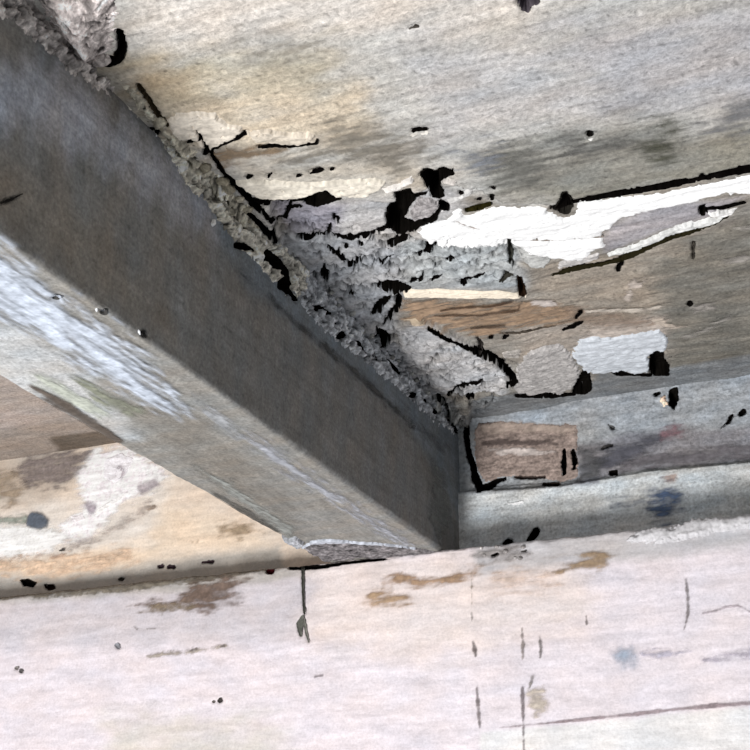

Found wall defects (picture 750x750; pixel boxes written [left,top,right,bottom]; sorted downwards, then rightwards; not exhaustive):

peeling [167,111,317,168]
hole [410,127,429,137]
peeling [235,167,750,269]
spalling [517,275,527,297]
spalling [293,263,464,435]
peeling [502,317,670,396]
spalling [474,421,613,487]
crack [289,558,386,643]